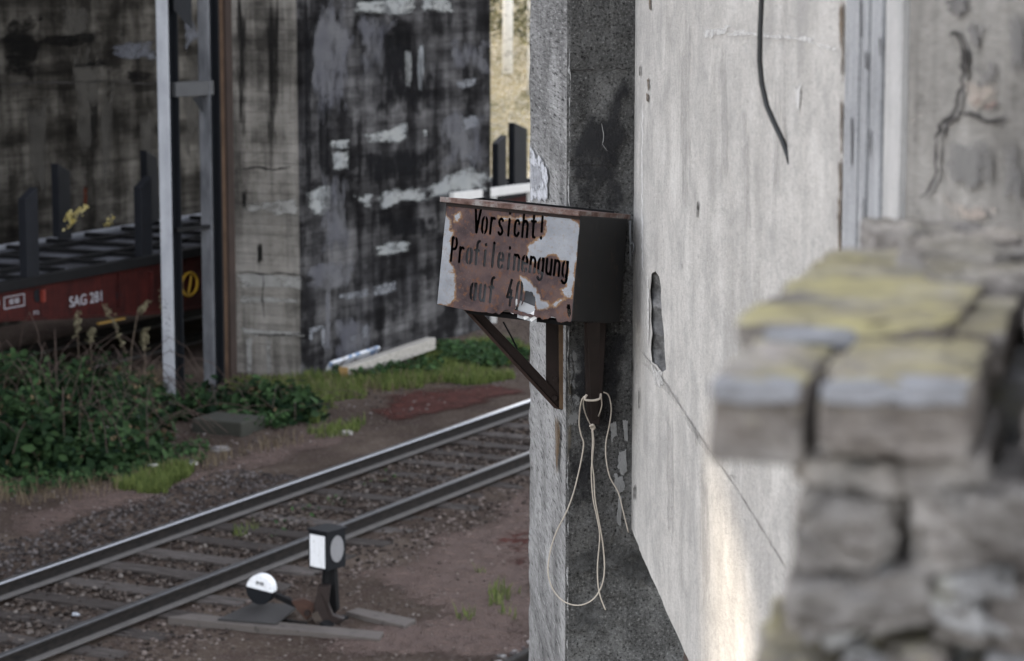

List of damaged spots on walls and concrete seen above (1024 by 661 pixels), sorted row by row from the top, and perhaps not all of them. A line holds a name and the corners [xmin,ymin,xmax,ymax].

water stain [2,18,42,79]
water stain [359,18,394,68]
water stain [73,50,114,179]
crack [920,30,1006,197]
water stain [326,281,395,358]
spalling [647,271,666,387]